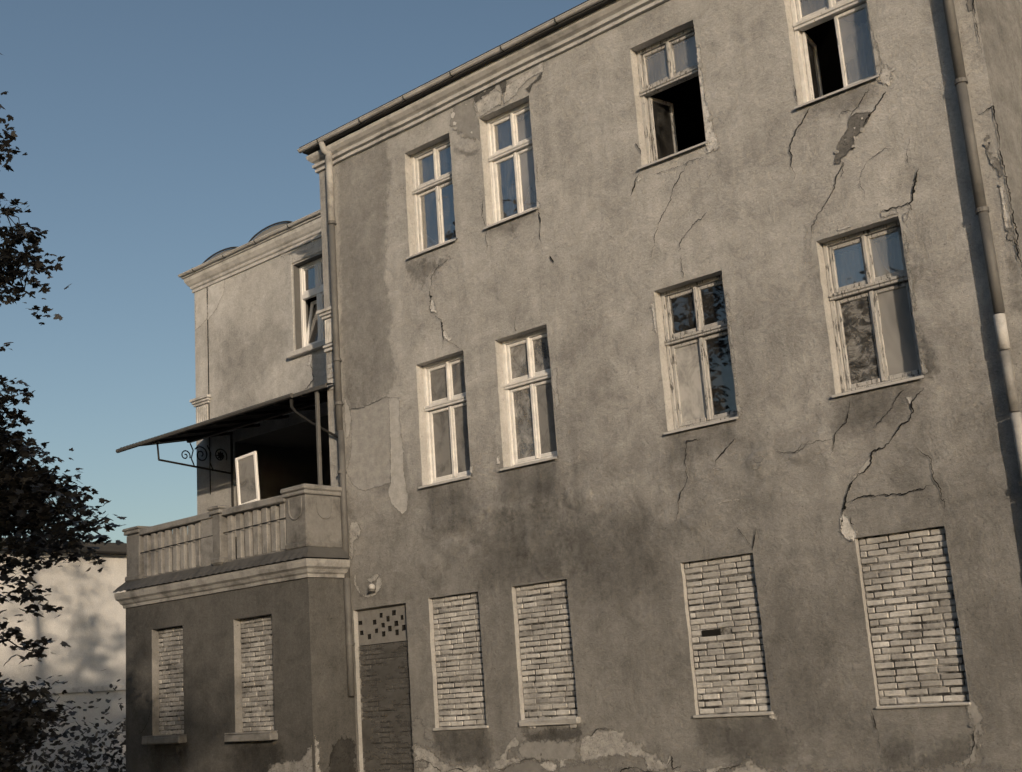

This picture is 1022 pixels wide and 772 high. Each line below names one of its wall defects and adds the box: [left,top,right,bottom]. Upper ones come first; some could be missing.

flaking render [450,61,544,141]
spalling [696,43,720,153]
crack [789,76,809,173]
spalling [834,111,871,164]
crack [630,143,712,256]
crack [811,139,918,230]
crack [978,105,1022,276]
crack [676,439,700,519]
crack [840,388,945,529]
flaking render [268,735,358,772]
flaking render [412,718,680,772]
flaking render [692,756,784,772]